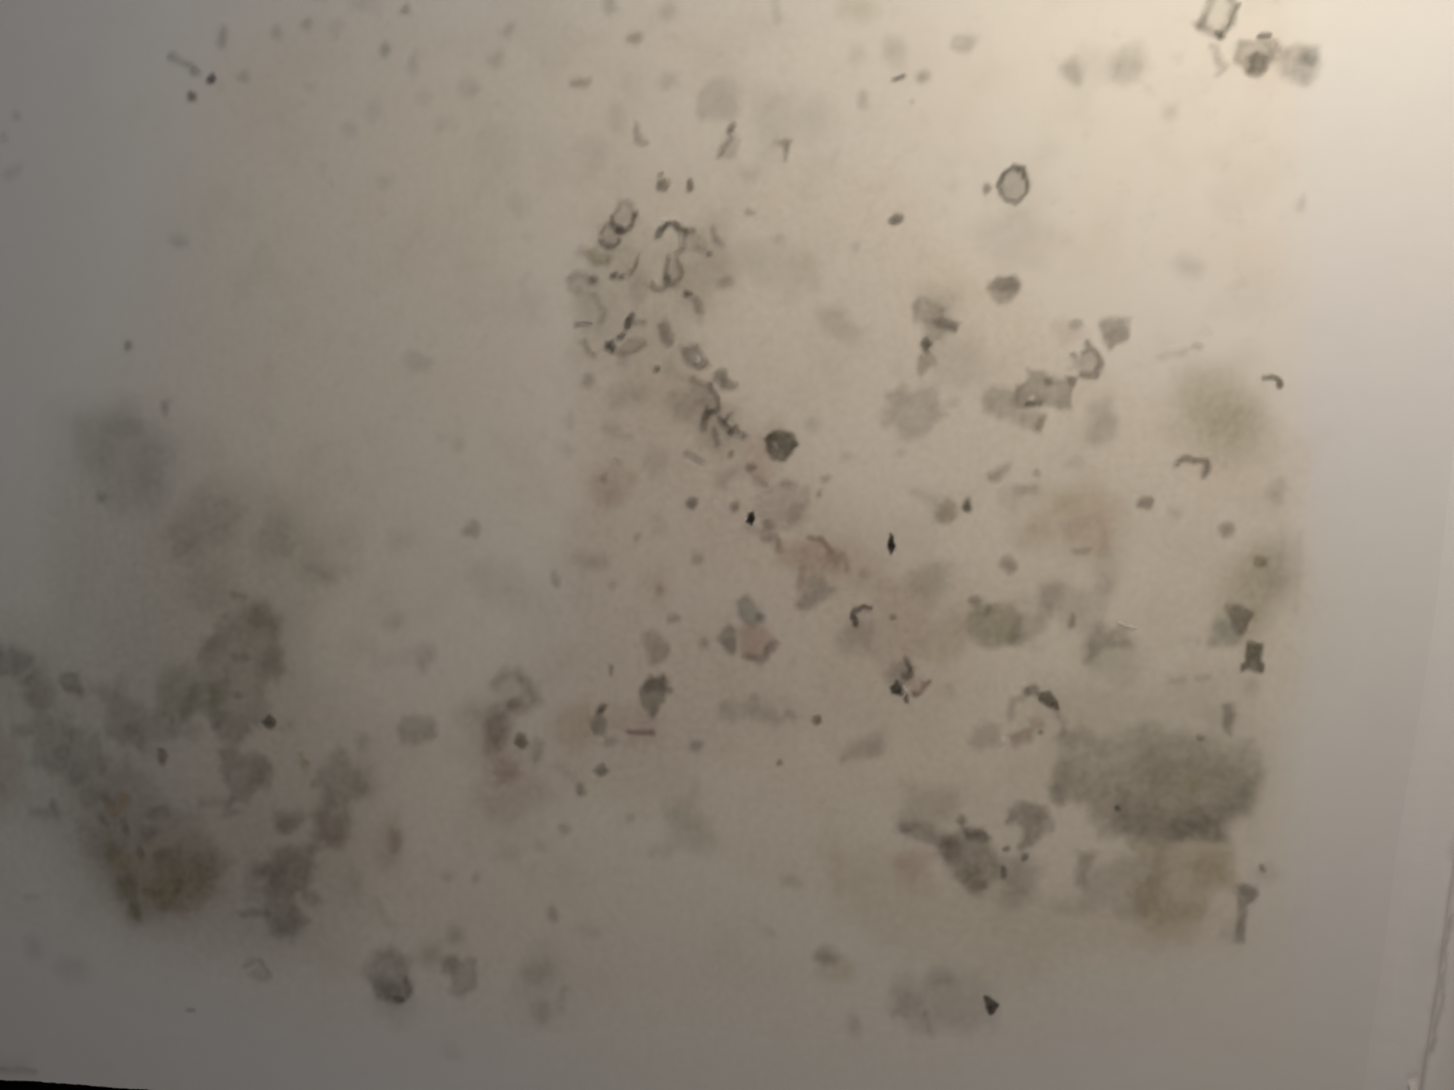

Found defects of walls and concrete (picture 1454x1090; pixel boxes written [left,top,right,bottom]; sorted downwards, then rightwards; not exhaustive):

leakage [1233,610,1263,670]
leakage [1040,692,1058,708]
leakage [985,996,999,1014]